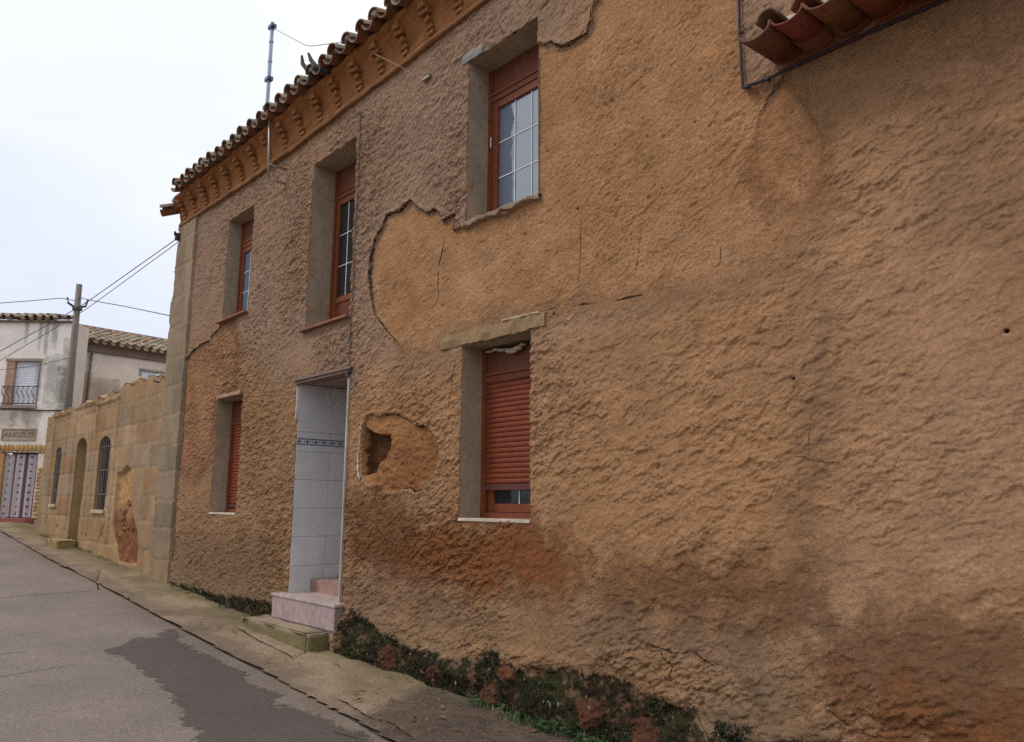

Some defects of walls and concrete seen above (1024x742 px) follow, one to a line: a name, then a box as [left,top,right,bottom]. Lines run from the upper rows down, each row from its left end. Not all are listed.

flaking render [368,0,840,365]
flaking render [357,410,440,493]
spalling [114,467,139,563]
damp [345,486,580,601]
damp [605,550,823,629]
damp [825,611,1024,742]